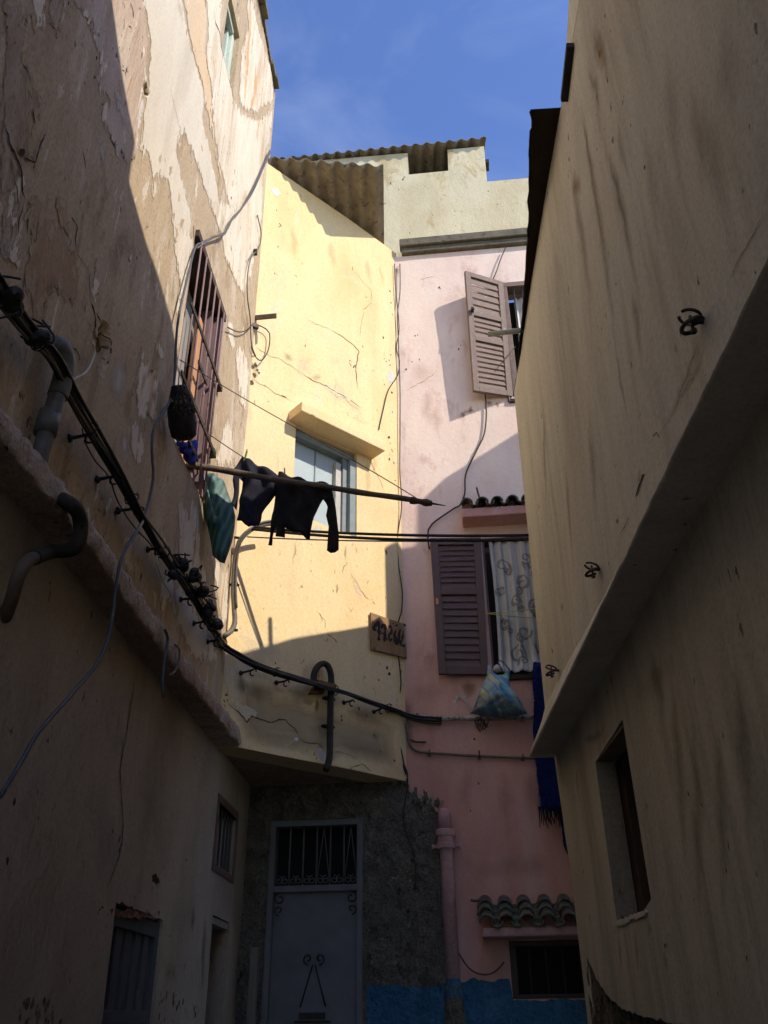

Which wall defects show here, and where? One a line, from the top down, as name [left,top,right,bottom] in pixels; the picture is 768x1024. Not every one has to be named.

flaking render [65,0,281,323]
crack [256,280,372,416]
crack [232,707,371,771]